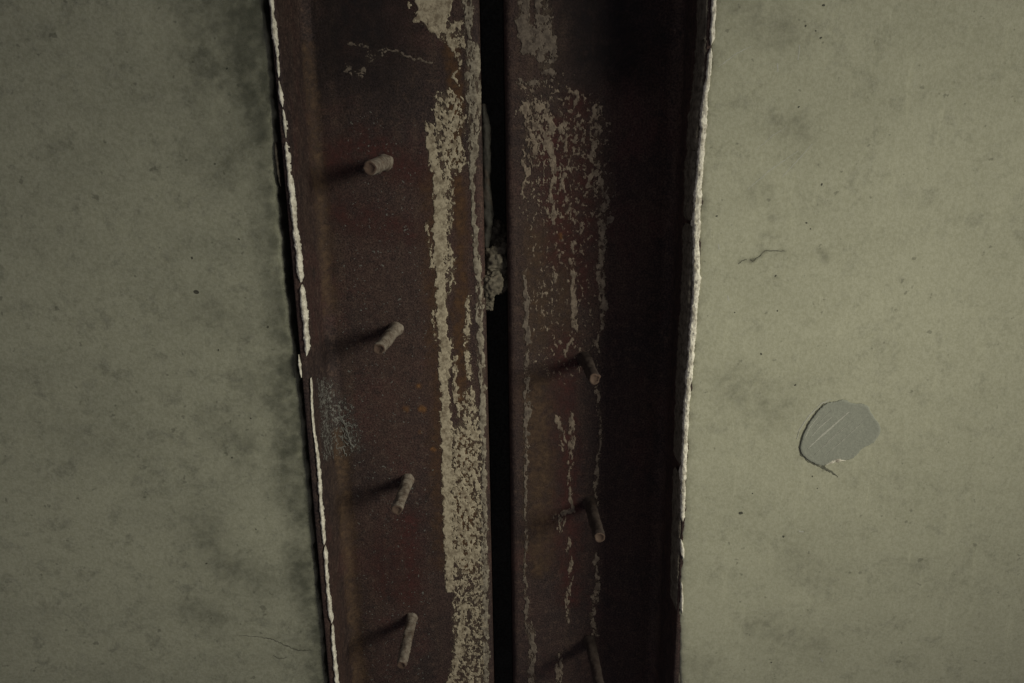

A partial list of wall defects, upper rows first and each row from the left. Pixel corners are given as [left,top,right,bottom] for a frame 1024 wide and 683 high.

rust [455,436,474,571]
peeling [800,399,881,489]